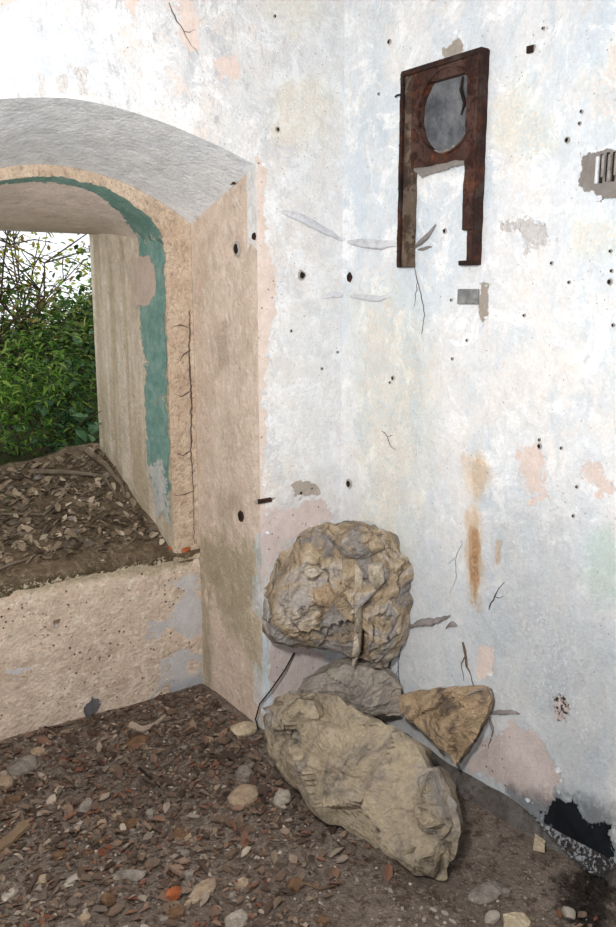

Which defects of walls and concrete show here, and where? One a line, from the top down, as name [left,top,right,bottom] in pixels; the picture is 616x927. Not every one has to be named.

crack [169,3,199,55]
spalling [577,148,616,203]
corrosion [467,511,481,595]
water stain [507,786,616,927]